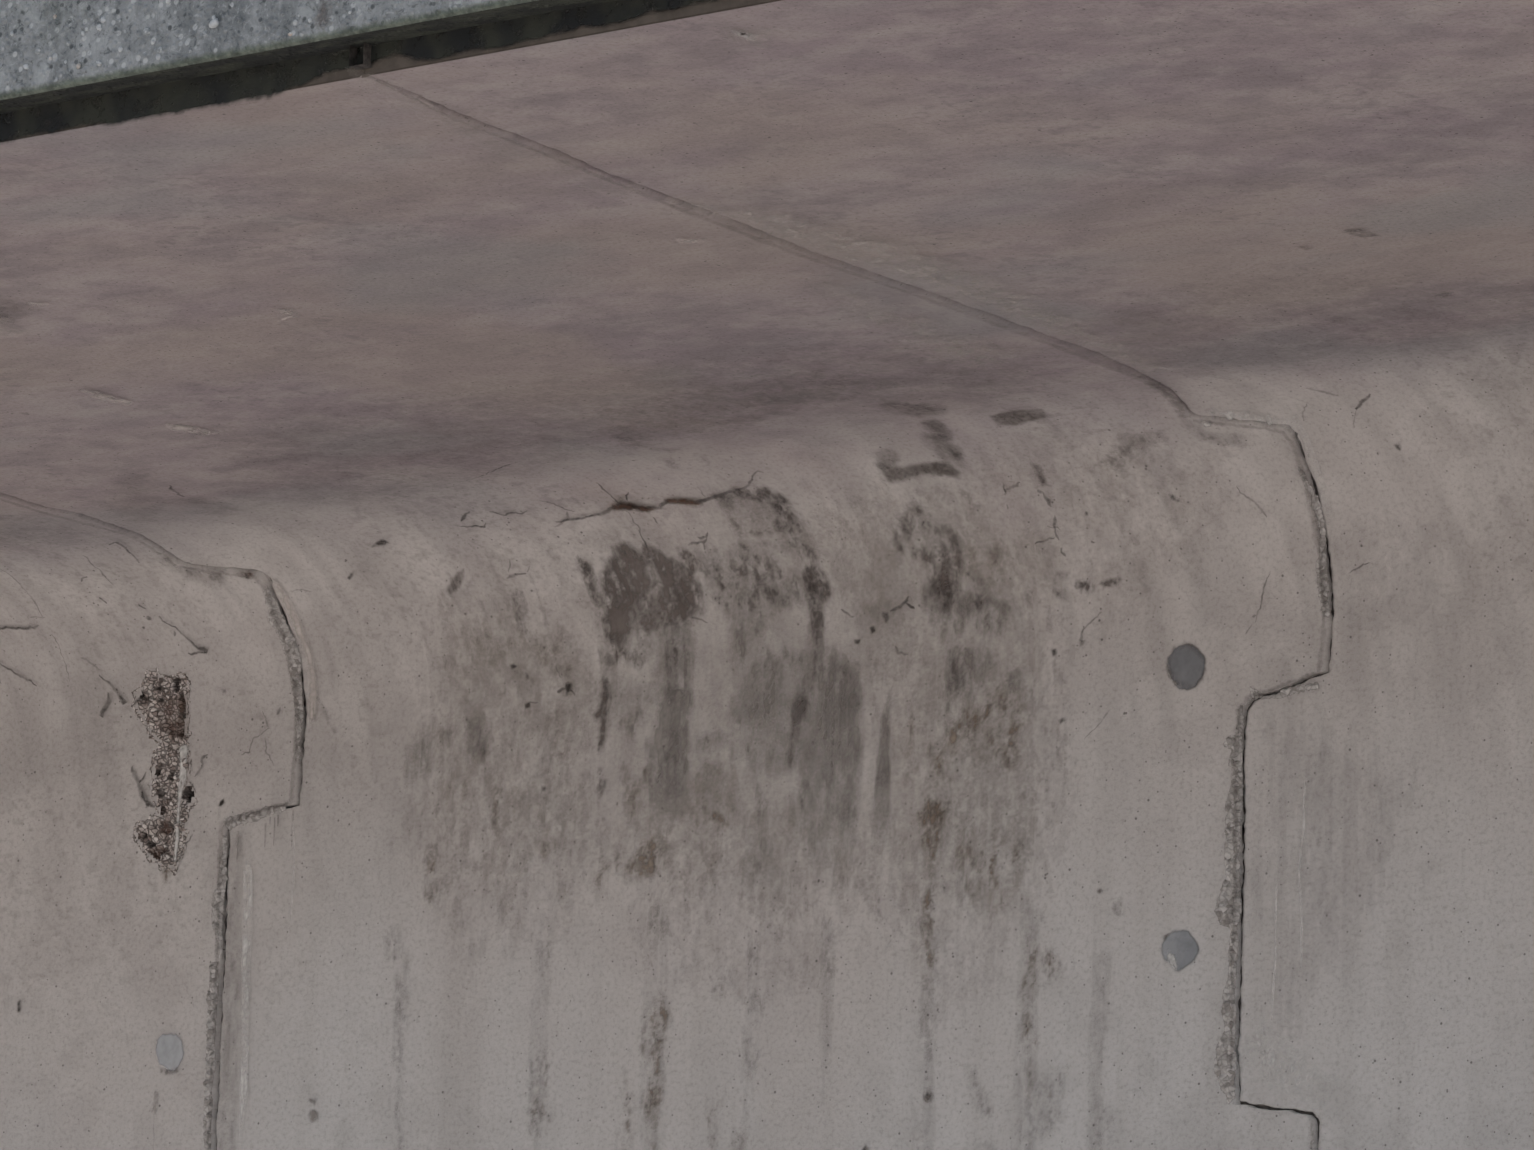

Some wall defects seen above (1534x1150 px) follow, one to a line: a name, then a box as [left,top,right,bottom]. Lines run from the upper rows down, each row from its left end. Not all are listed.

water stain [581,544,702,662]
crack [562,475,753,547]
water stain [721,487,799,532]
water stain [898,508,1005,630]
spalling [131,668,208,878]
water stain [594,685,608,746]
water stain [644,648,709,796]
water stain [714,524,860,811]
water stain [876,715,889,795]
water stain [935,675,1020,772]